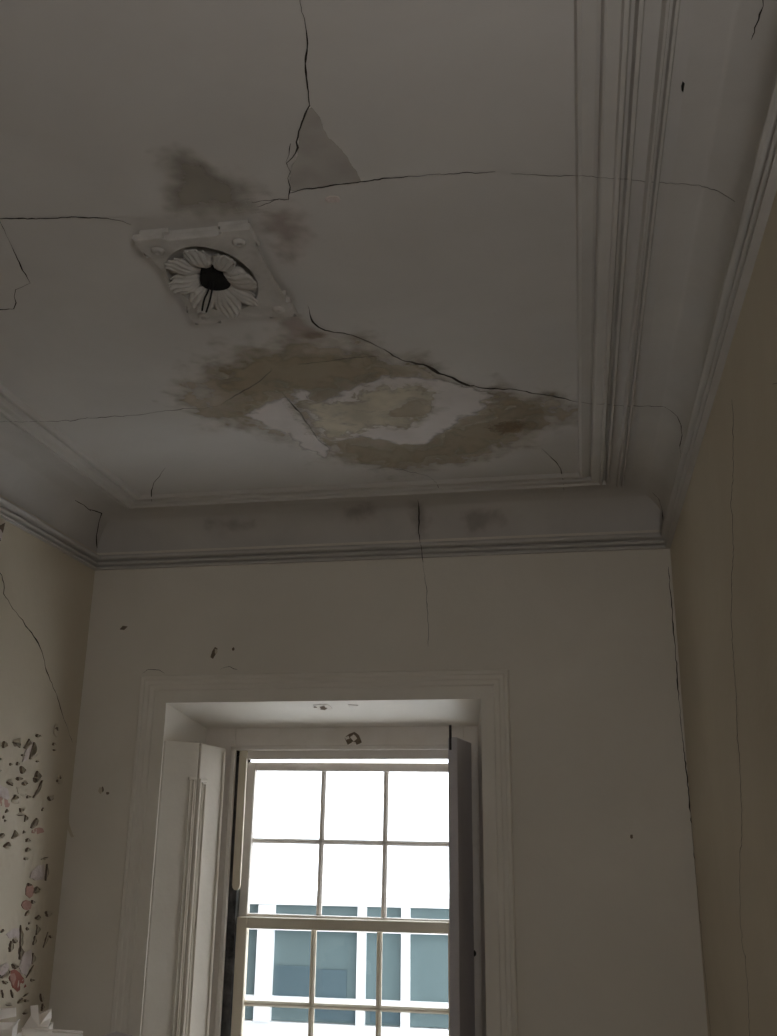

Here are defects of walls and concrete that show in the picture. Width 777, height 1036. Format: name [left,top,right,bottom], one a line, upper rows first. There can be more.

crack [252,3,488,207]
crack [0,217,131,310]
peeling [245,375,493,457]
leakage [183,334,574,468]
crack [307,307,682,452]
crack [0,573,72,740]
peeling [0,722,65,1021]
crack [668,567,711,1034]